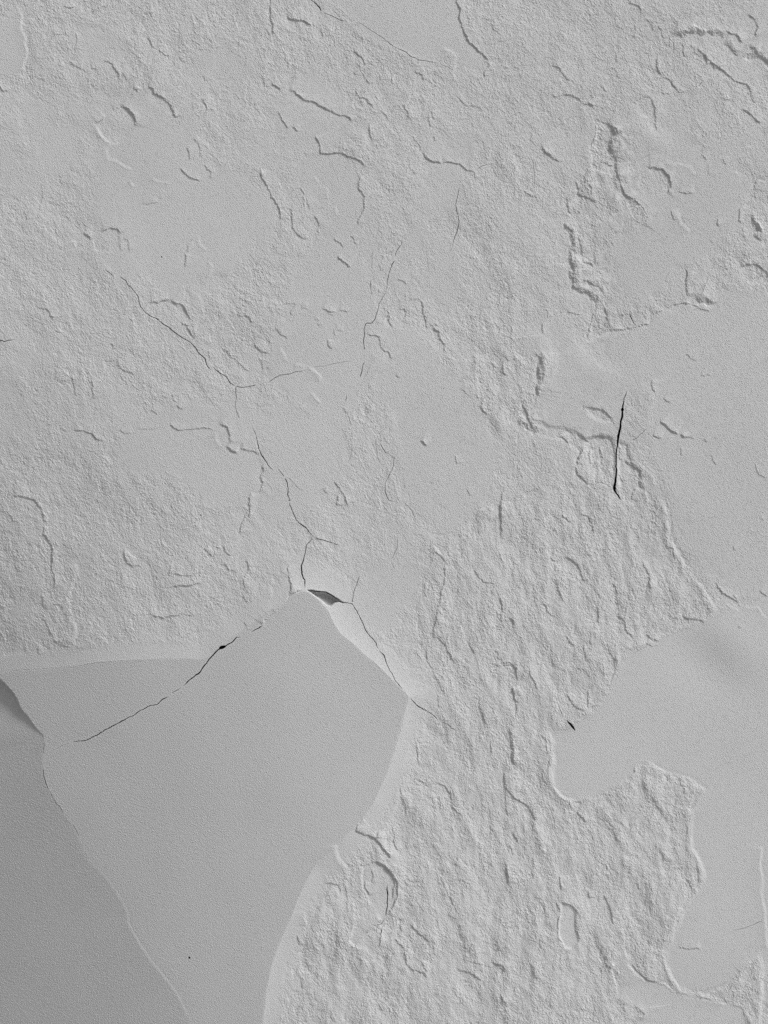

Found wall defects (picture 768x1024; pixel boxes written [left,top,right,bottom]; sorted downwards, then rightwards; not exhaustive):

crack [43,626,262,859]
crack [105,242,455,730]
flaking render [263,351,768,1024]
crack [613,392,646,500]